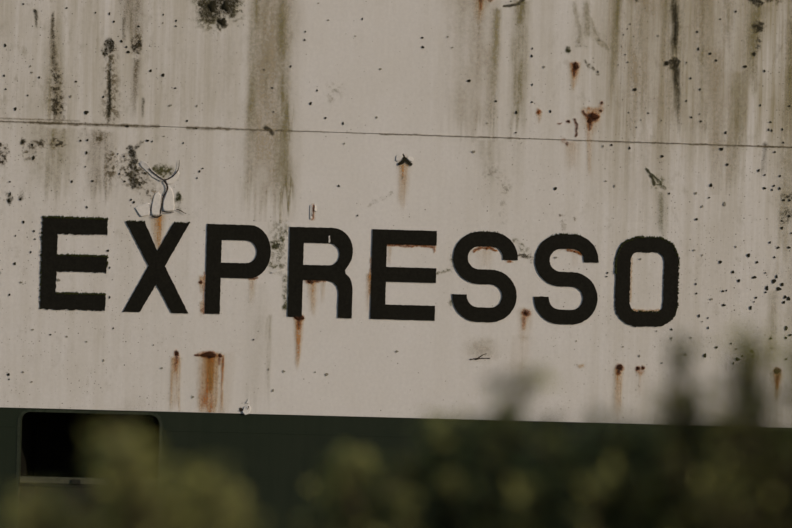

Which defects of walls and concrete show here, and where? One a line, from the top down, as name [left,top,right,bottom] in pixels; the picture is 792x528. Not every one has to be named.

water stain [613,0,639,91]
water stain [664,0,687,107]
water stain [248,0,293,211]
rust [559,101,603,137]
rust [294,316,304,355]
rust [194,351,224,412]